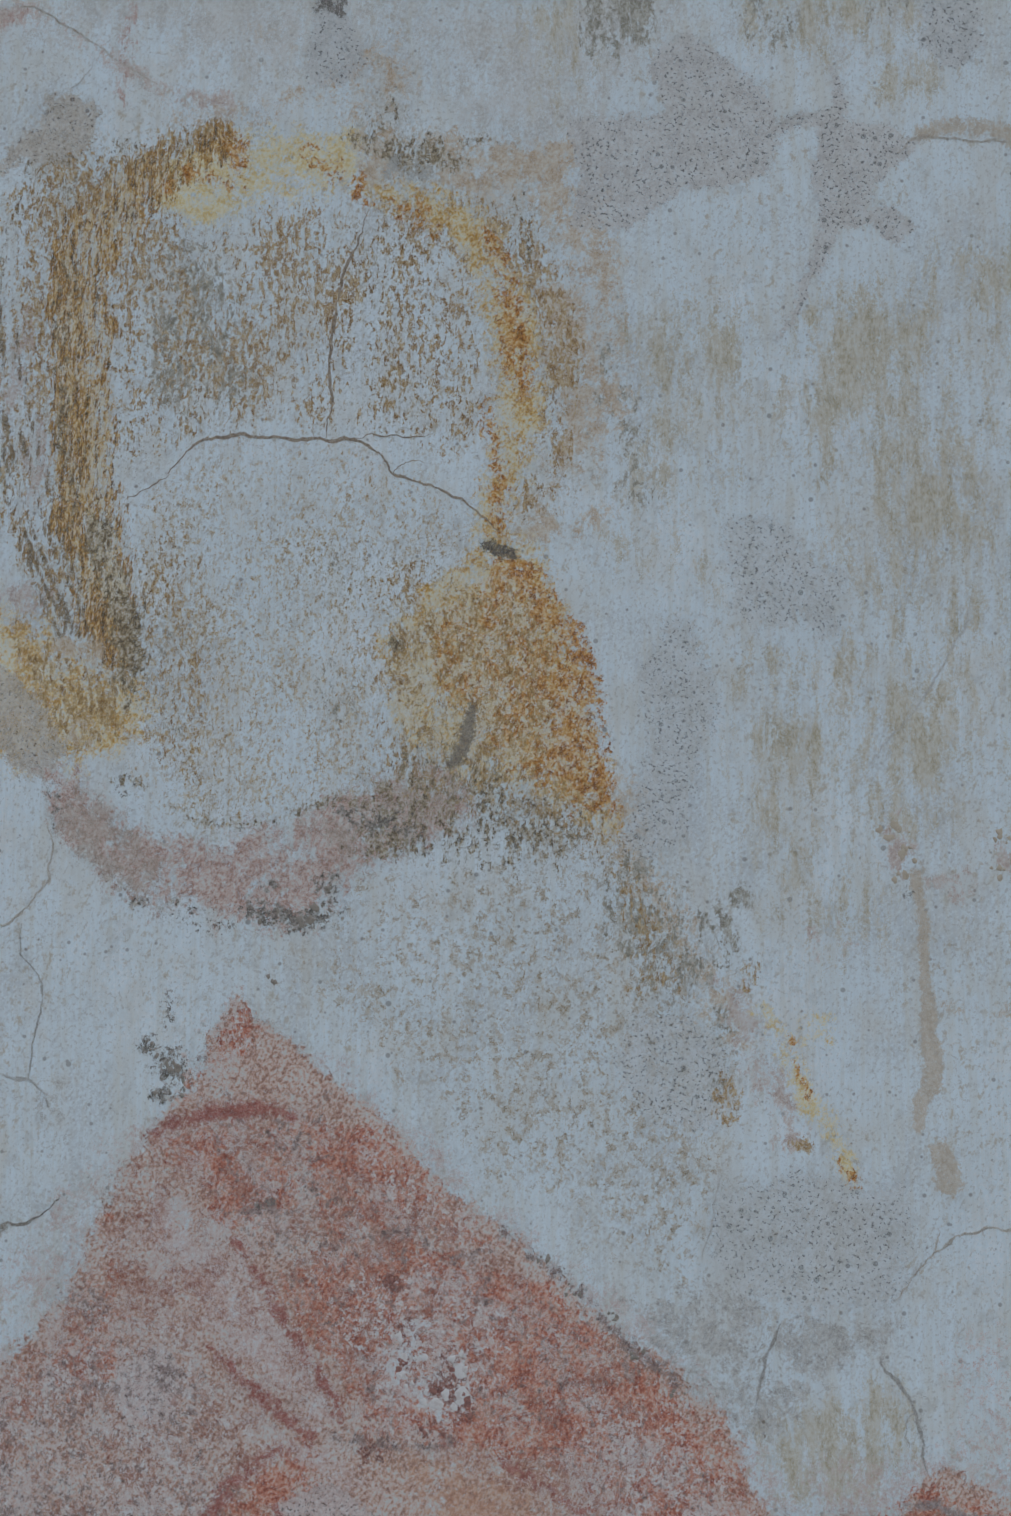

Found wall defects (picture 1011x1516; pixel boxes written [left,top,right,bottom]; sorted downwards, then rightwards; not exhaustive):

crack [125,211,501,532]
crack [0,819,54,1113]
crack [890,1226,1011,1304]
crack [754,1324,780,1408]
crack [879,1357,928,1474]